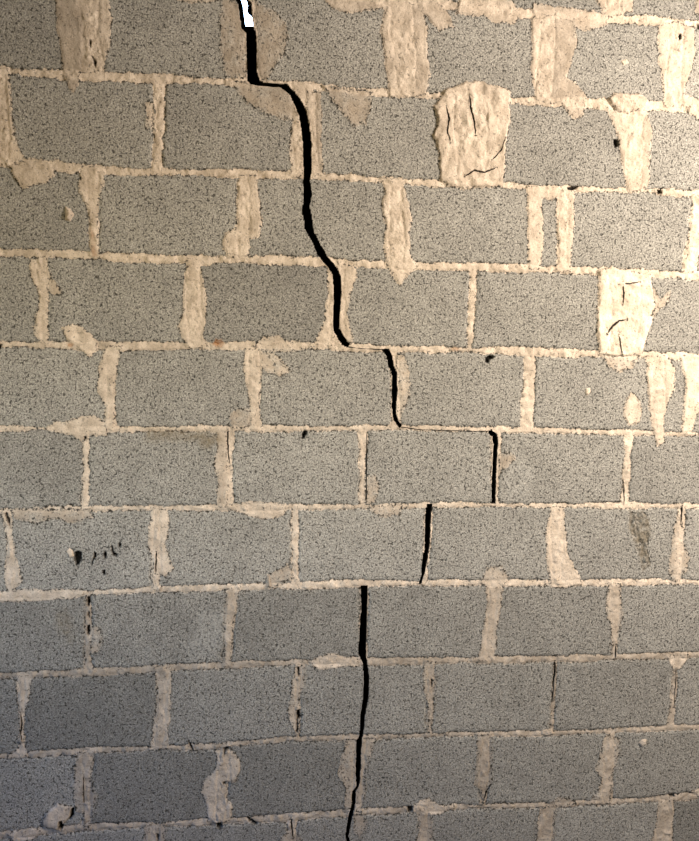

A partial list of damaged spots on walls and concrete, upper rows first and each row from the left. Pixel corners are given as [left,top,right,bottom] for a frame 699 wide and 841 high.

crack [228,0,500,503]
crack [225,429,233,466]
crack [418,504,434,584]
crack [344,585,371,841]
crack [287,819,295,838]